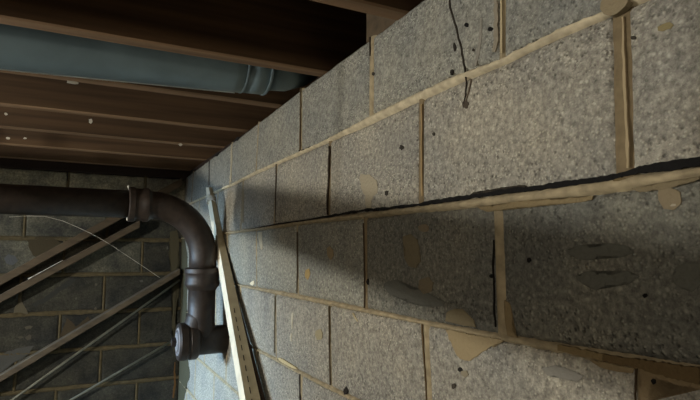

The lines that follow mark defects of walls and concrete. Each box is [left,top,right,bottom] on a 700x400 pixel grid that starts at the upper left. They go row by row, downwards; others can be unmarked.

crack [449,0,472,104]
crack [242,146,700,308]
crack [490,240,498,327]